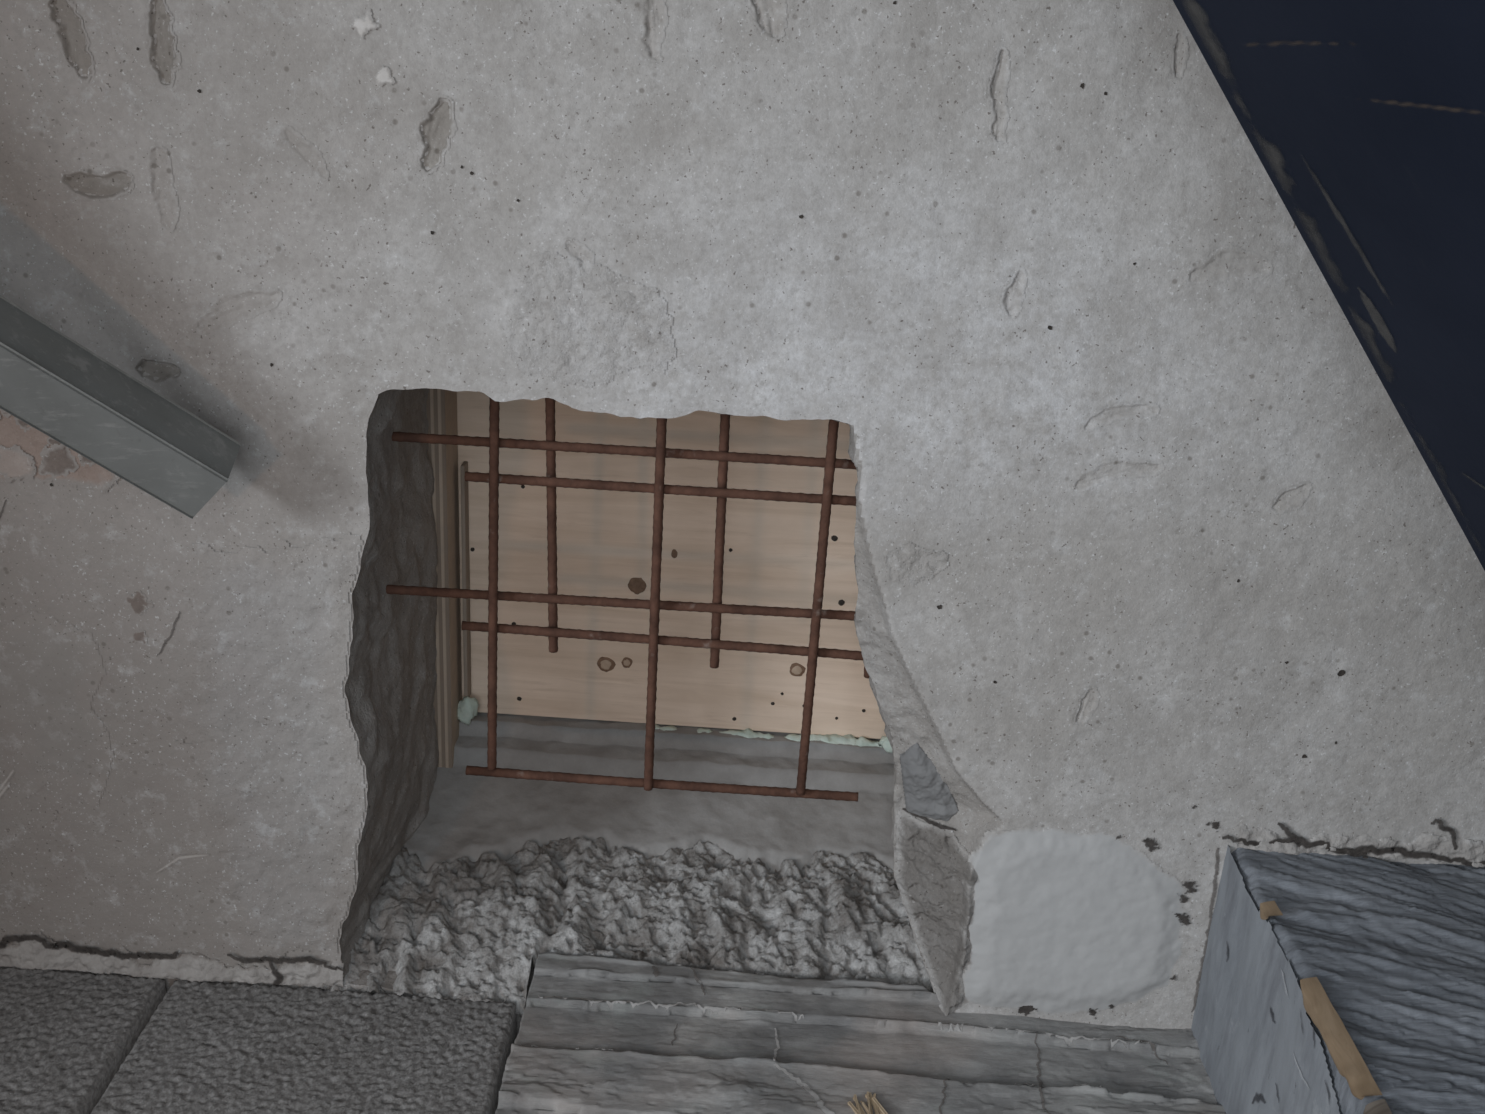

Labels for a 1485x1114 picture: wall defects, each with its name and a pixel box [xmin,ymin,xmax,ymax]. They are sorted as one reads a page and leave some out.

spalling [45,0,96,84]
spalling [136,0,182,88]
spalling [416,95,474,175]
peeling [0,408,120,493]
spalling [173,532,978,1018]
crack [0,935,179,960]
crack [227,954,345,986]
crack [1191,819,1485,1012]